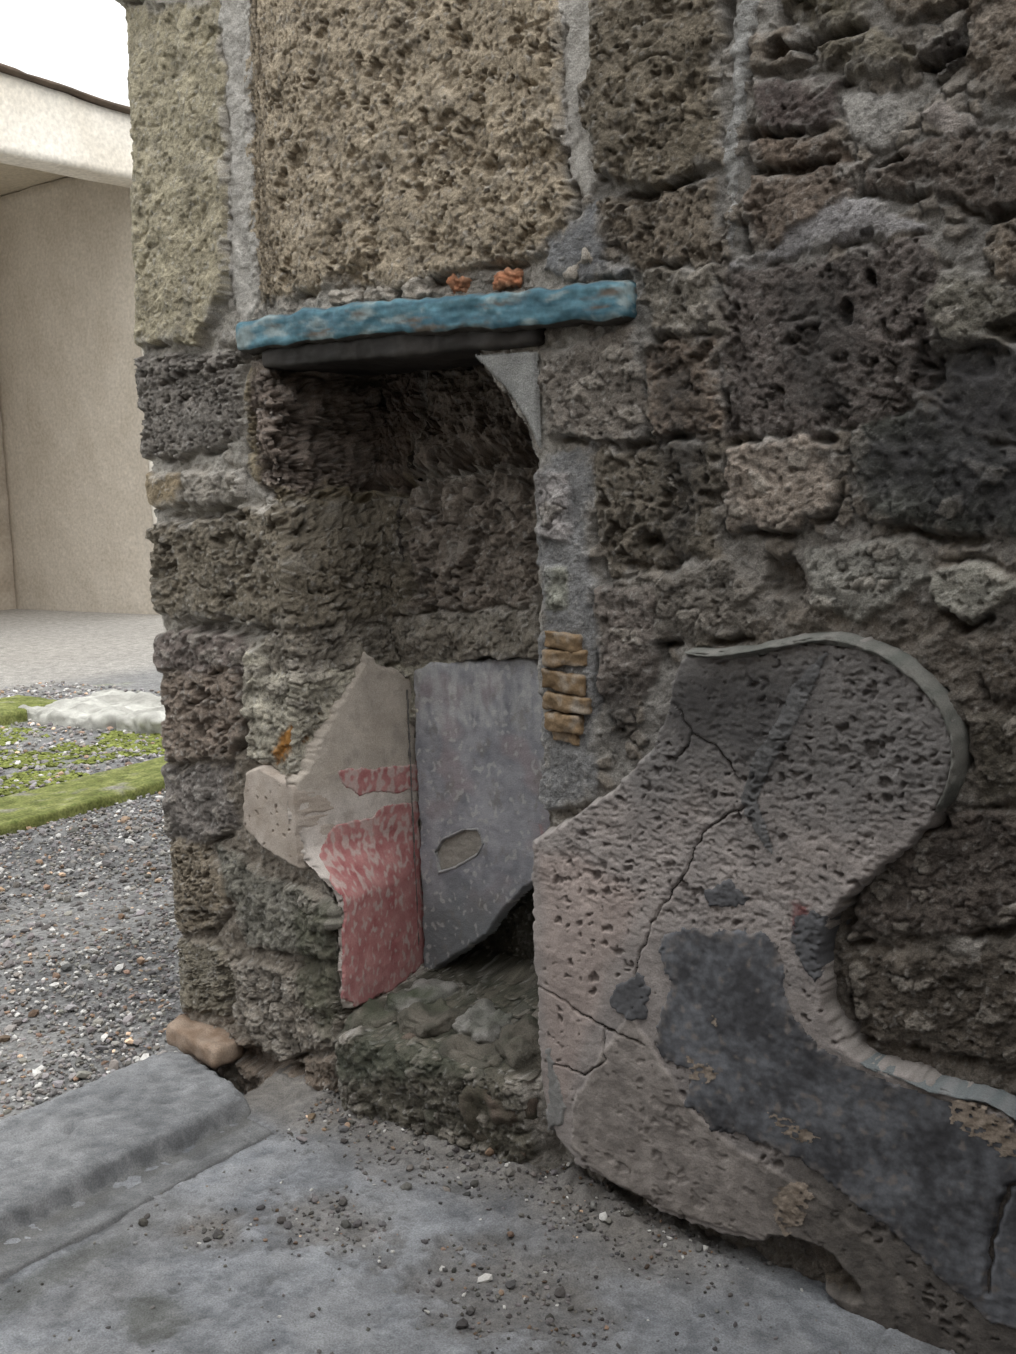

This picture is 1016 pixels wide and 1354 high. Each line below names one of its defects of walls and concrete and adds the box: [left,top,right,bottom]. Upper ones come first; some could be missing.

peeling [319,761,484,1008]
crack [540,986,638,1076]
peeling [767,1112,821,1144]
peeling [949,1099,1016,1157]
peeling [773,1182,815,1237]
spalling [809,1242,861,1294]